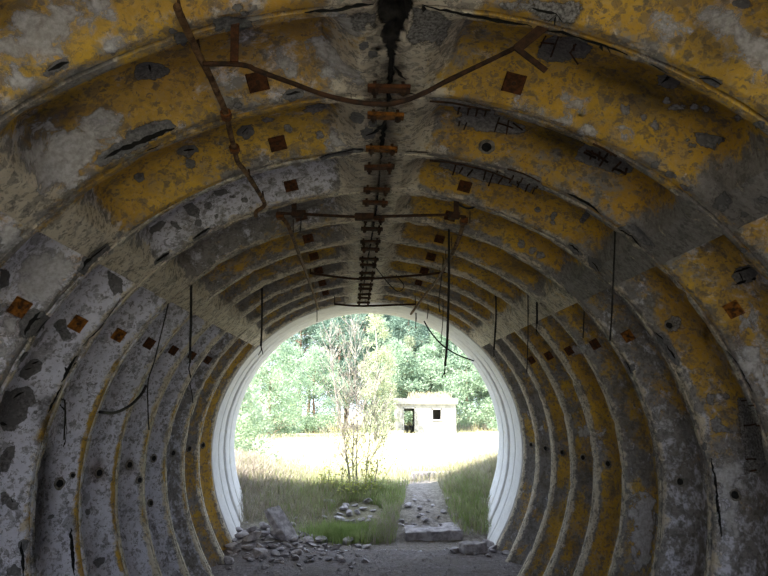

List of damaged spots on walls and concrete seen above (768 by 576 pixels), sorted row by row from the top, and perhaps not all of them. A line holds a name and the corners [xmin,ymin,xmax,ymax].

peeling [0,0,116,90]
spalling [134,62,170,80]
crack [304,3,374,13]
spalling [499,0,593,65]
peeling [20,107,175,194]
spalling [430,97,527,135]
spalling [551,93,634,175]
spalling [686,132,725,153]
spalling [732,265,757,285]
peeling [0,244,110,432]
crack [711,458,722,537]
crack [68,528,76,576]